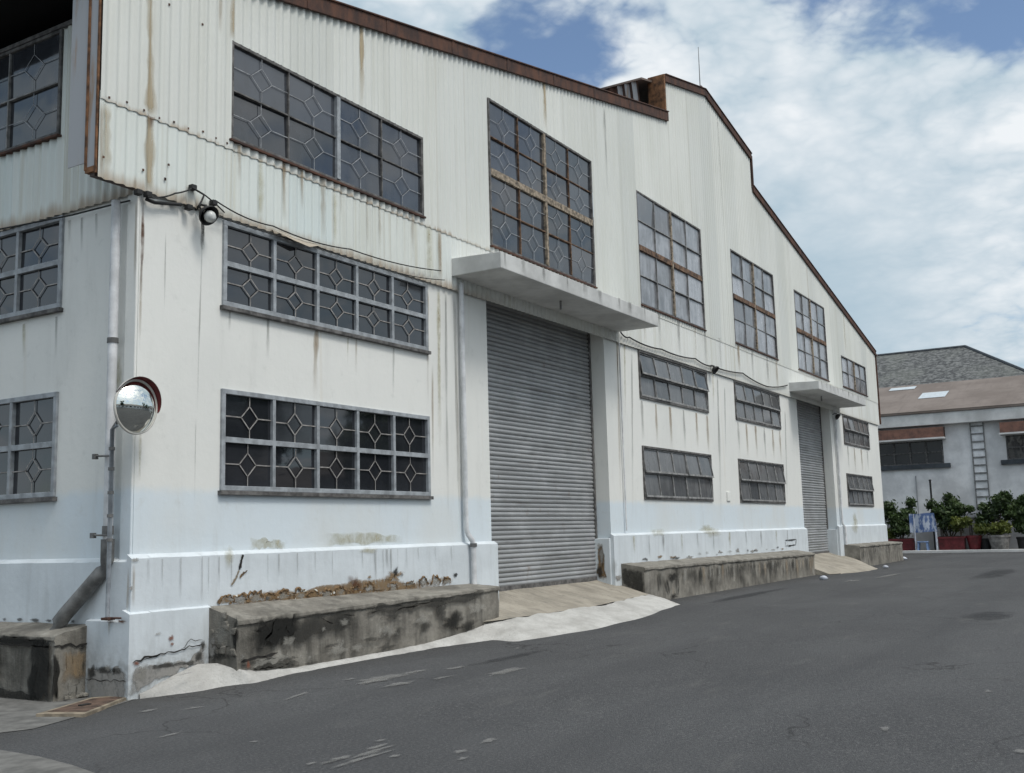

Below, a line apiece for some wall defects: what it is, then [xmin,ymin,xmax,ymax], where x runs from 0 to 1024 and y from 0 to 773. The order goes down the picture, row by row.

crack [231,555,248,586]
peeling [217,568,458,604]
spalling [597,546,606,578]
crack [133,639,201,663]